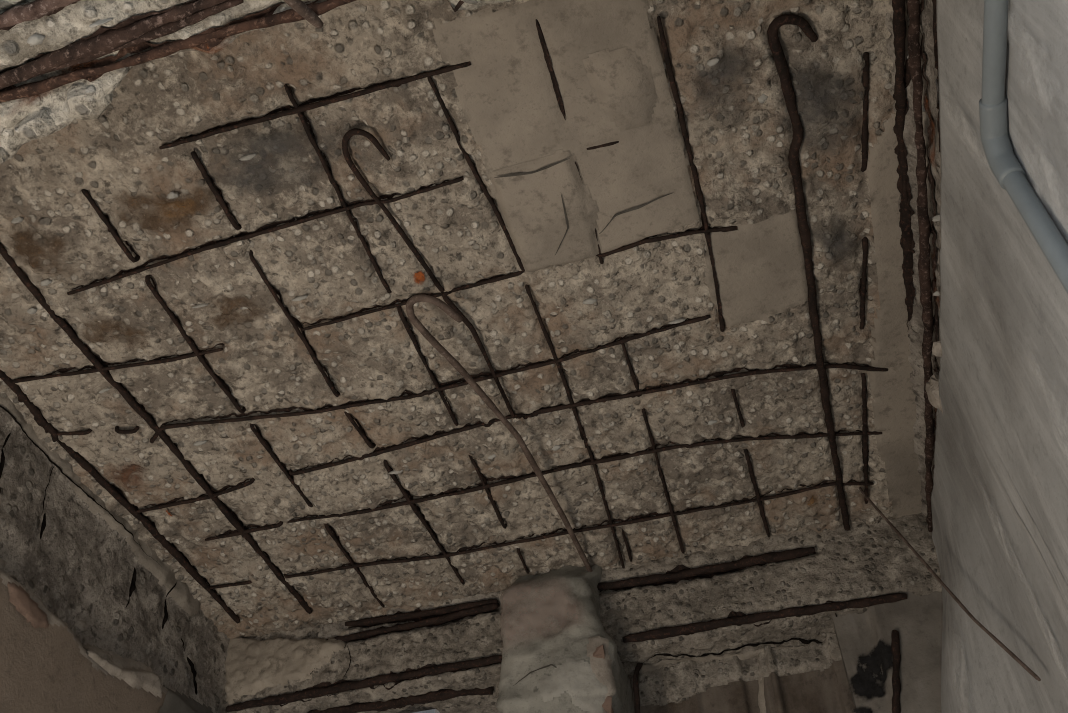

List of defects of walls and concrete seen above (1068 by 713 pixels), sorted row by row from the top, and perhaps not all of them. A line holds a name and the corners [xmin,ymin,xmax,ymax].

crack [0,405,158,607]
corrosion [121,189,213,231]
crack [162,582,198,695]
spalling [0,0,585,713]
spalling [304,0,896,570]
spalling [897,0,942,516]